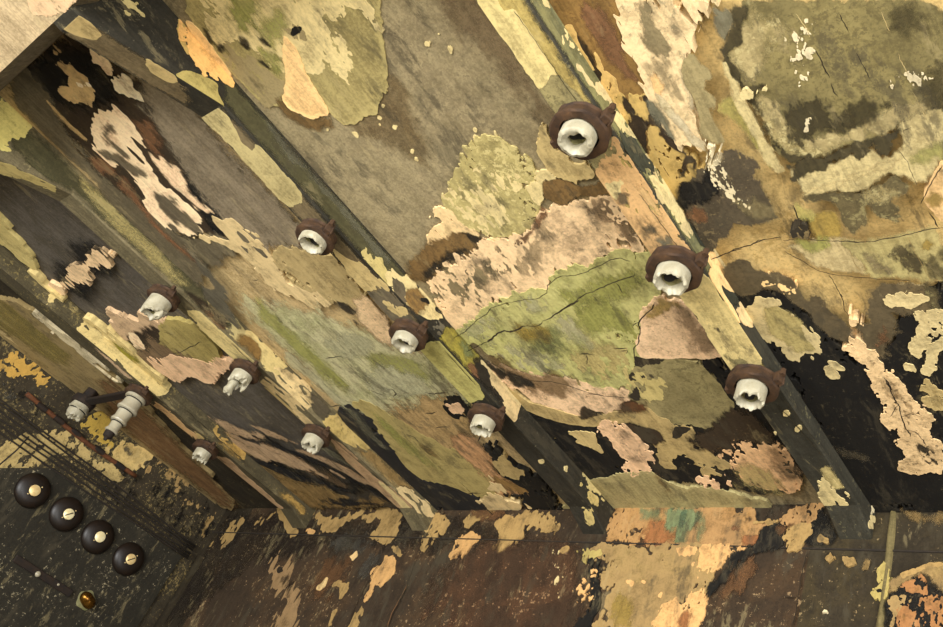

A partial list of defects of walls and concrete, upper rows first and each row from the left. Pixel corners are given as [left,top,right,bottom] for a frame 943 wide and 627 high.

flaking render [0,0,721,627]
crack [447,258,635,398]
crack [581,302,655,364]
peeling [481,249,943,627]
crack [711,53,943,316]